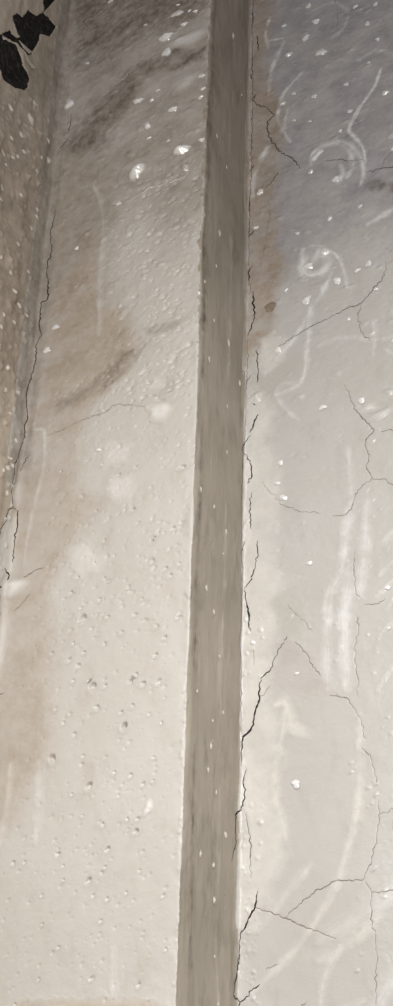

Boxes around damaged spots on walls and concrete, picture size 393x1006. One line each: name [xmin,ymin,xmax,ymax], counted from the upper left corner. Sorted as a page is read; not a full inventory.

peeling [0,0,55,90]
crack [0,210,143,610]
crack [232,0,393,1006]